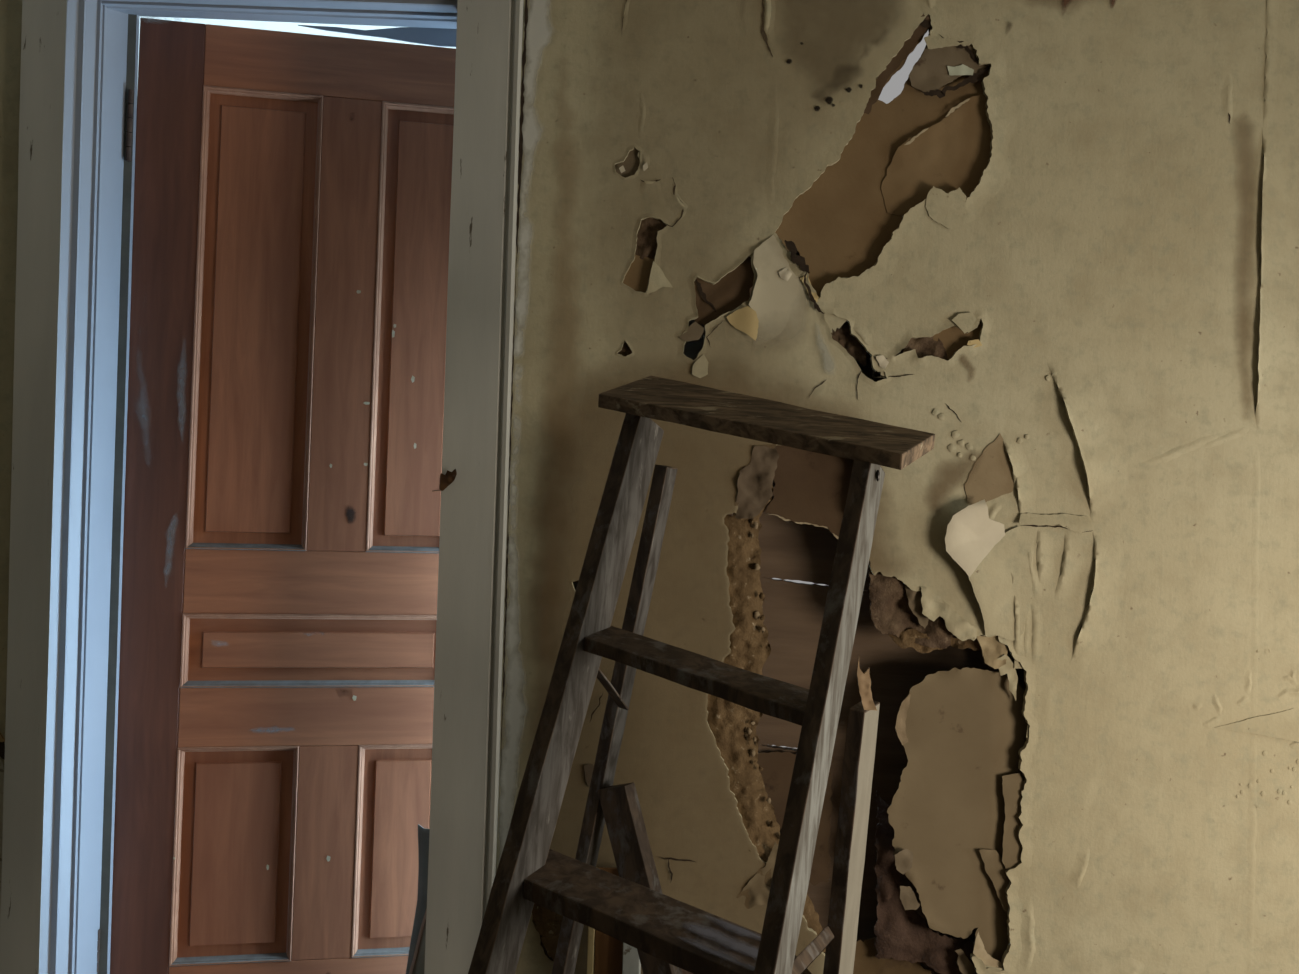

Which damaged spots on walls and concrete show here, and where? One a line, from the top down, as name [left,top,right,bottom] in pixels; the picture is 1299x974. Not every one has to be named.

peeling [947,64,974,76]
peeling [612,143,650,181]
spalling [619,212,672,298]
spalling [615,338,635,359]
spalling [875,308,993,376]
spalling [723,445,854,675]
spalling [853,409,1039,974]
spalling [707,694,796,909]
spalling [803,756,834,952]
flaking render [532,903,560,962]